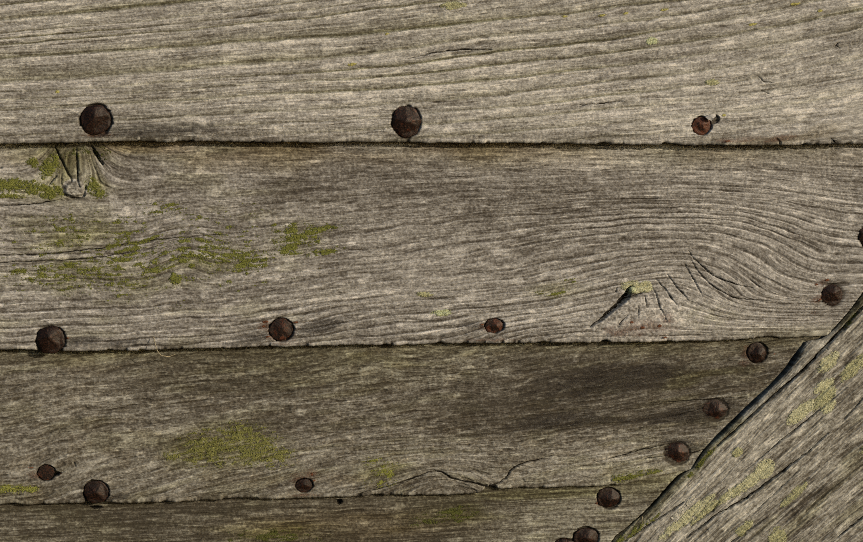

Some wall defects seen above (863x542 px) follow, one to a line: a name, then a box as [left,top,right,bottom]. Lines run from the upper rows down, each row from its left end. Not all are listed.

crack [588,254,770,328]
crack [358,455,552,496]